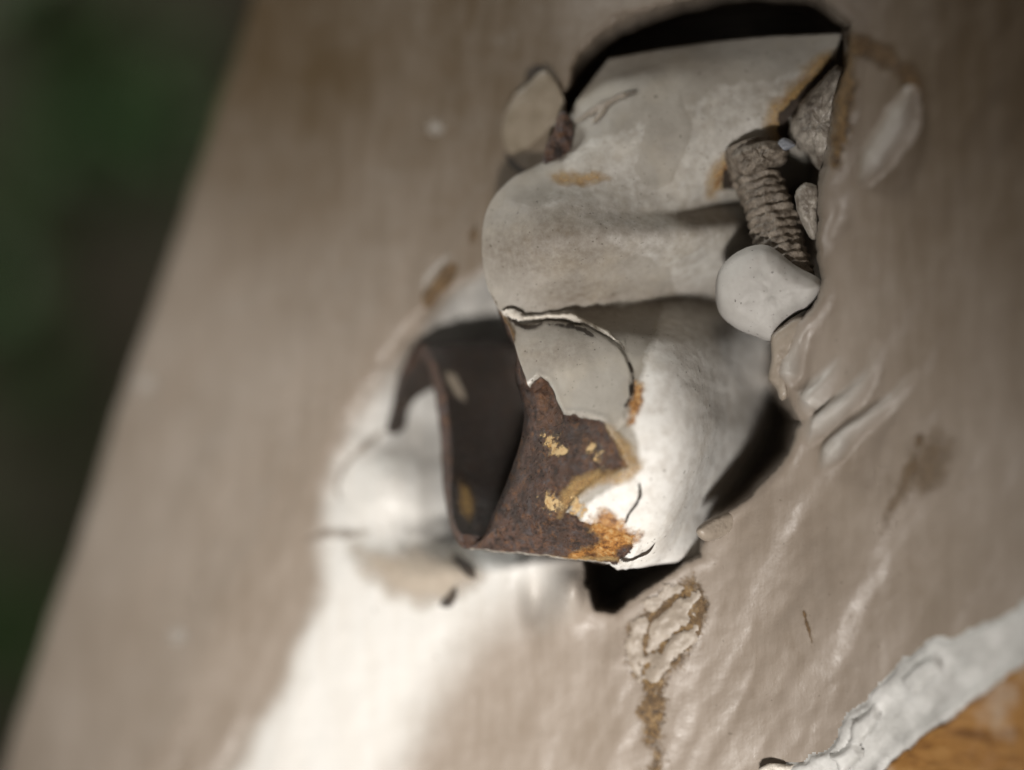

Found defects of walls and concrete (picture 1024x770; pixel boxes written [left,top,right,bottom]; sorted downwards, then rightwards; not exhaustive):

peeling [502,65,574,173]
peeling [502,309,625,350]
peeling [624,362,634,407]
corrosion [472,377,643,565]
peeling [624,576,709,770]
peeling [759,600,1024,770]